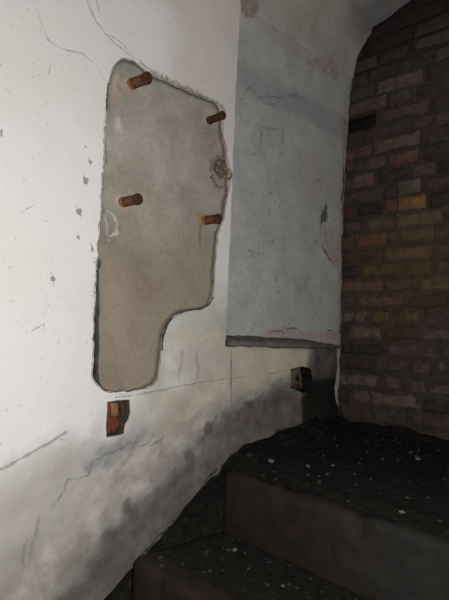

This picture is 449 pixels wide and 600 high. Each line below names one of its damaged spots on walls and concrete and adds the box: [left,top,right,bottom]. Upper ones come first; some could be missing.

rust [117,72,141,99]
rust [111,190,133,218]
spalling [91,58,233,438]
rust [192,207,211,233]
peeling [315,204,341,272]
crack [103,380,201,399]
water stain [159,336,224,393]
crack [0,432,66,470]
water stain [0,417,161,596]
water stain [47,371,299,600]